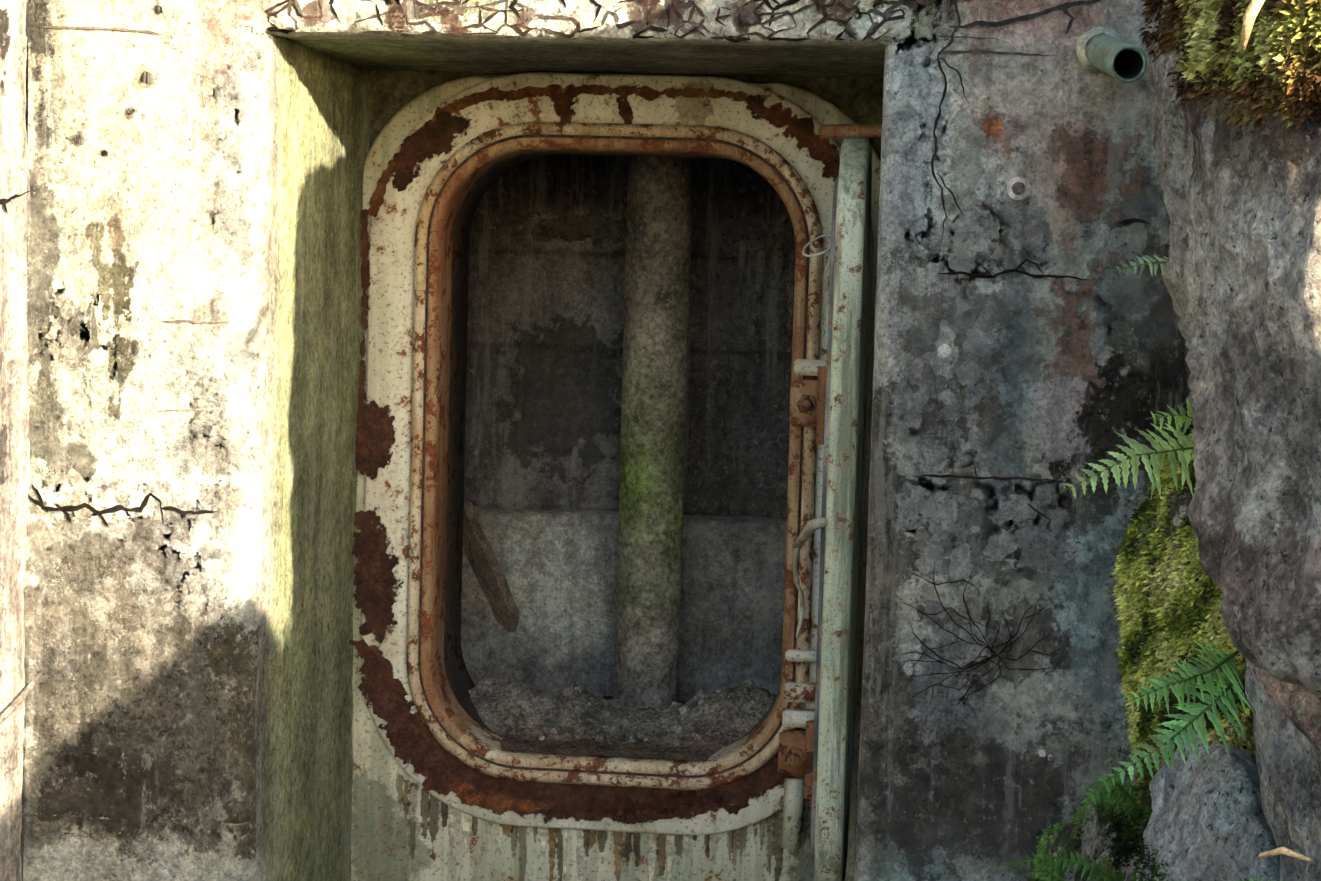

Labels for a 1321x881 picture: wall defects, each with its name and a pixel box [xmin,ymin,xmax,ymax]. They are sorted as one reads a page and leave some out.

crack [28,485,217,528]
rust [350,507,812,881]
rust [355,83,840,480]
crack [234,0,1101,280]
crack [908,620,993,670]
peeling [892,182,1050,468]
peeling [892,478,1072,581]
water stain [1042,243,1193,536]
crack [1119,217,1150,225]